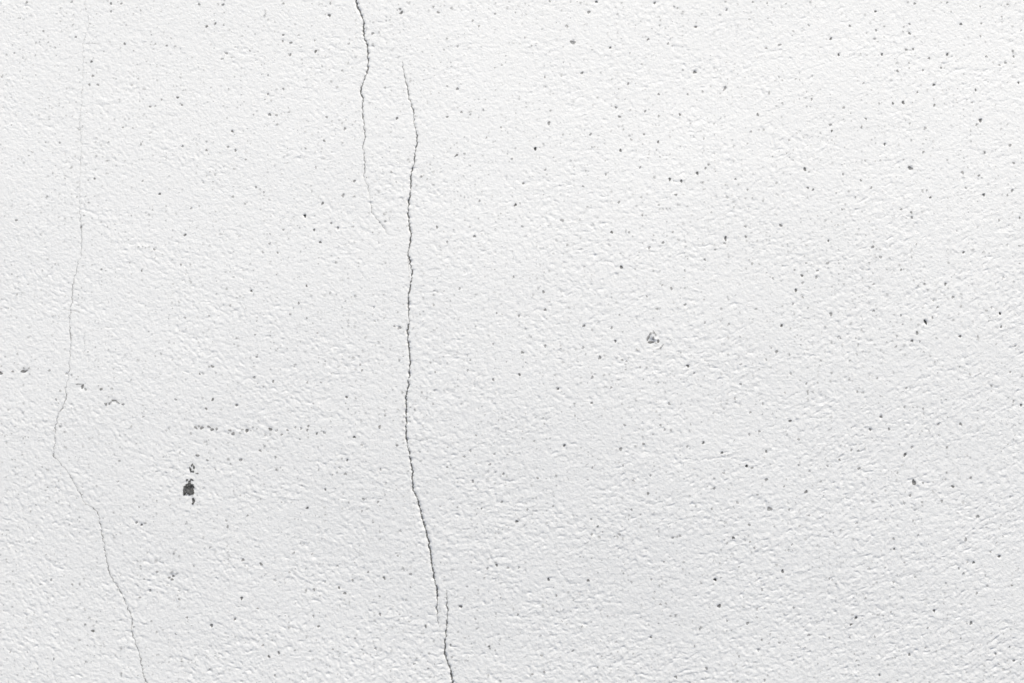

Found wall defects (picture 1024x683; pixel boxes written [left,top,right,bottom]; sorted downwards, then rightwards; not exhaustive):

crack [355,0,369,169]
crack [404,76,454,683]